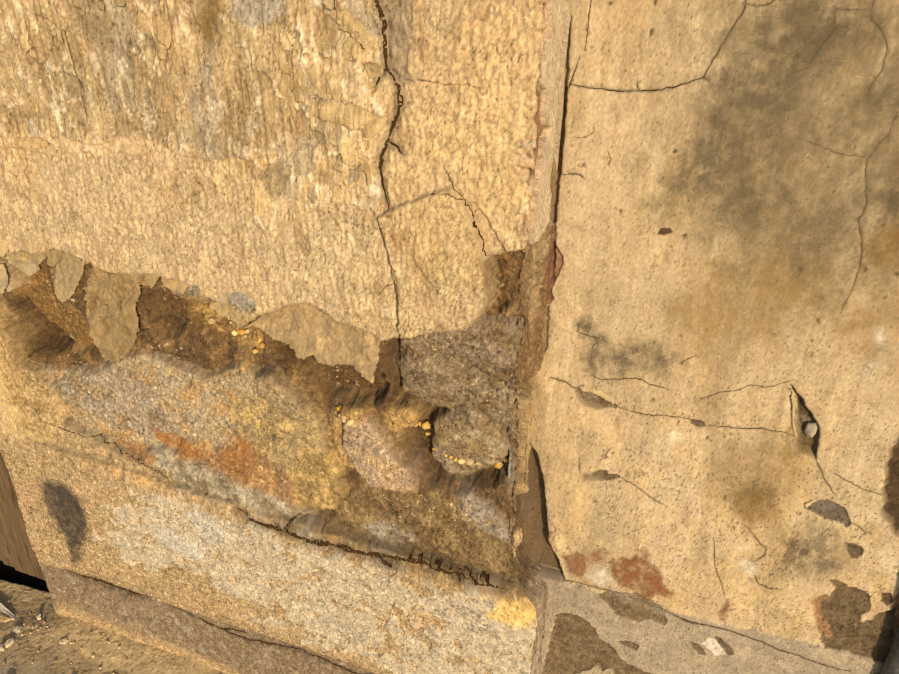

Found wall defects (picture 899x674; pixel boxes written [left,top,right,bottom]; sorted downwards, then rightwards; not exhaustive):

crack [375,0,479,240]
crack [552,0,774,177]
damp [720,0,899,275]
crack [426,167,489,256]
crack [809,116,899,307]
spalling [0,0,653,674]
damp [613,347,639,374]
spalling [790,387,820,458]
spalling [882,438,899,531]
corrosion [565,553,599,576]
corrosion [612,555,672,599]
spalling [813,579,899,662]